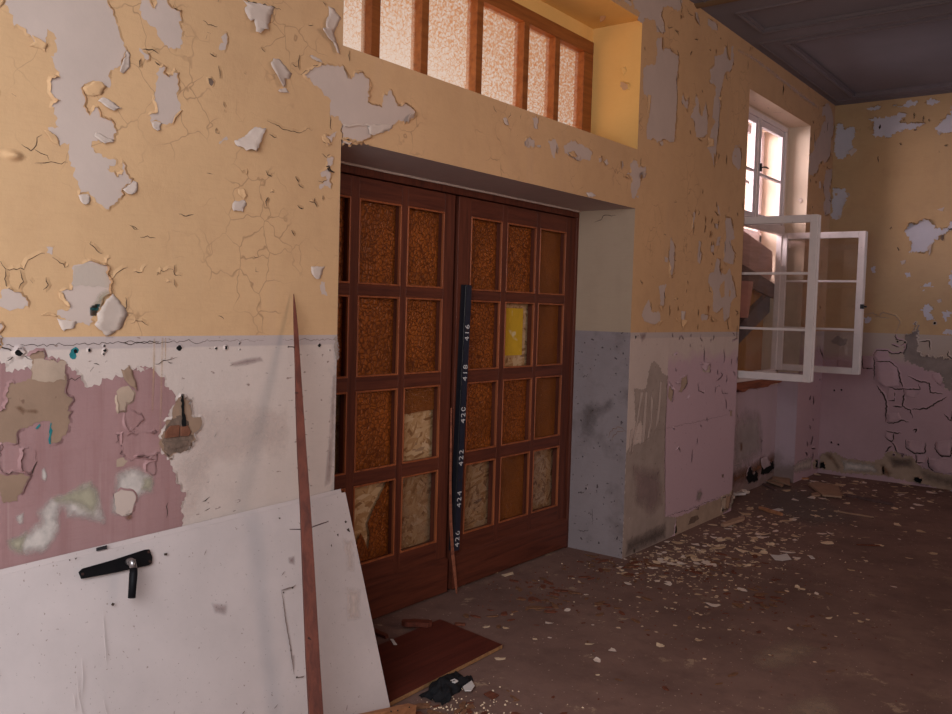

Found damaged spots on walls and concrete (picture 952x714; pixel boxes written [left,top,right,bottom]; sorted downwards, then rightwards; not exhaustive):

peeling [0,0,185,212]
crack [139,45,177,71]
crack [267,118,313,138]
crack [265,170,325,236]
peeling [271,6,417,189]
peeling [619,0,734,167]
peeling [808,97,952,220]
crack [90,241,183,325]
crack [0,339,32,364]
hole [159,393,204,460]
peeling [622,361,734,558]
crack [861,334,952,473]